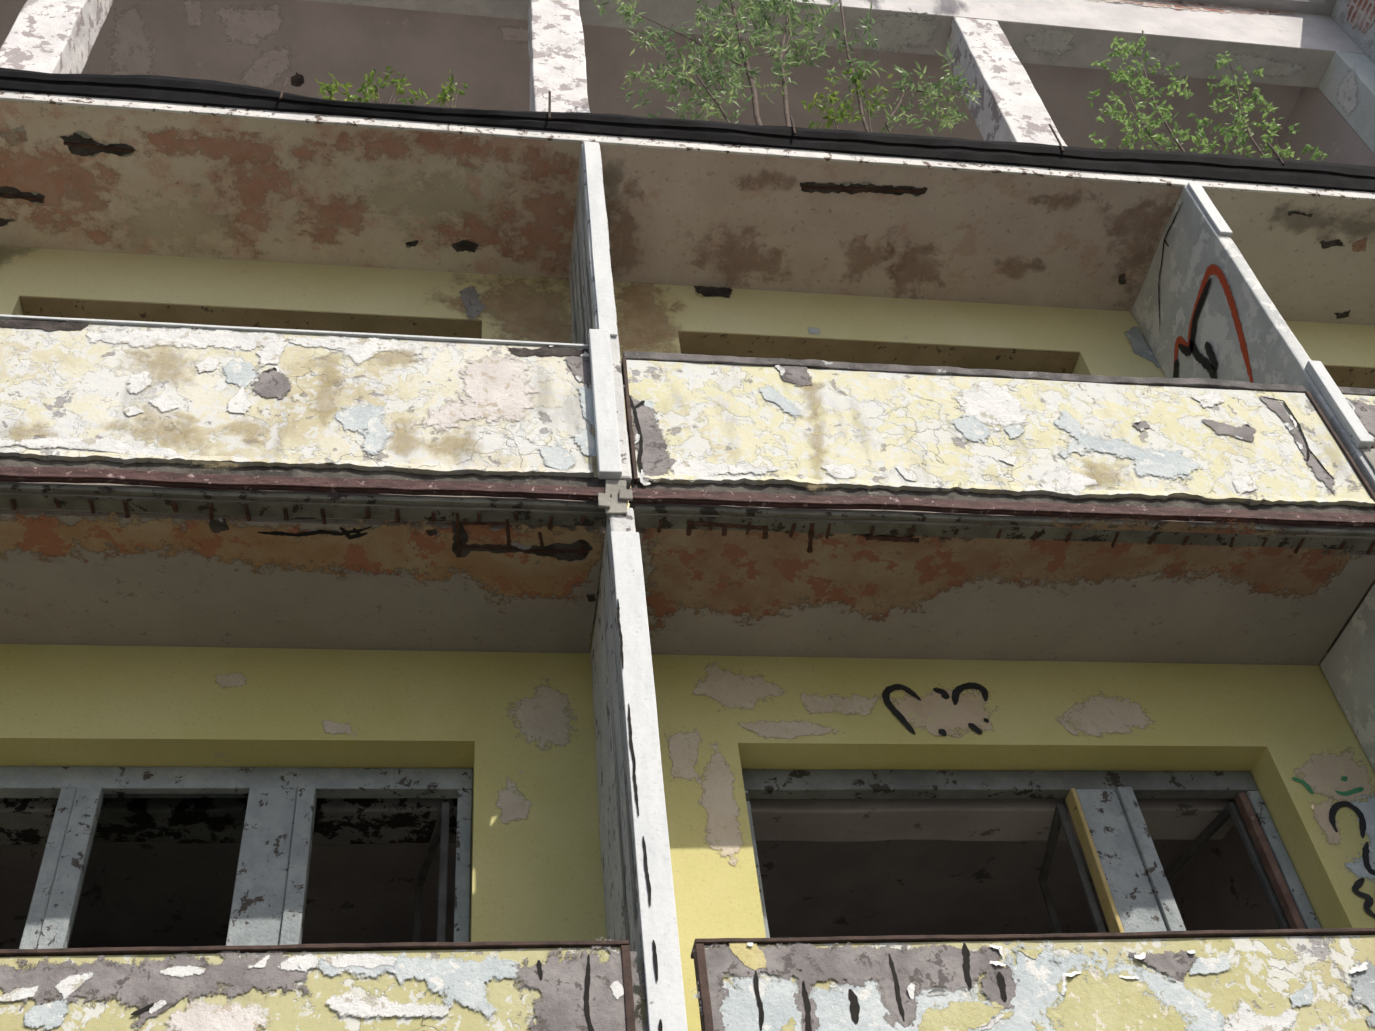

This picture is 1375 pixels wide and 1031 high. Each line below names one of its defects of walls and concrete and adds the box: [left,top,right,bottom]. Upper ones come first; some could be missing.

flaking render [1347,0,1375,34]
spalling [60,132,136,157]
spalling [800,182,928,197]
peeling [0,318,428,414]
spalling [0,345,605,487]
flaking render [759,365,813,419]
peeling [623,380,1375,637]
peeling [1056,691,1155,736]
peeling [665,729,744,866]
flaking render [0,938,649,1031]
peeling [692,940,1313,1031]
peeling [1337,956,1375,1031]